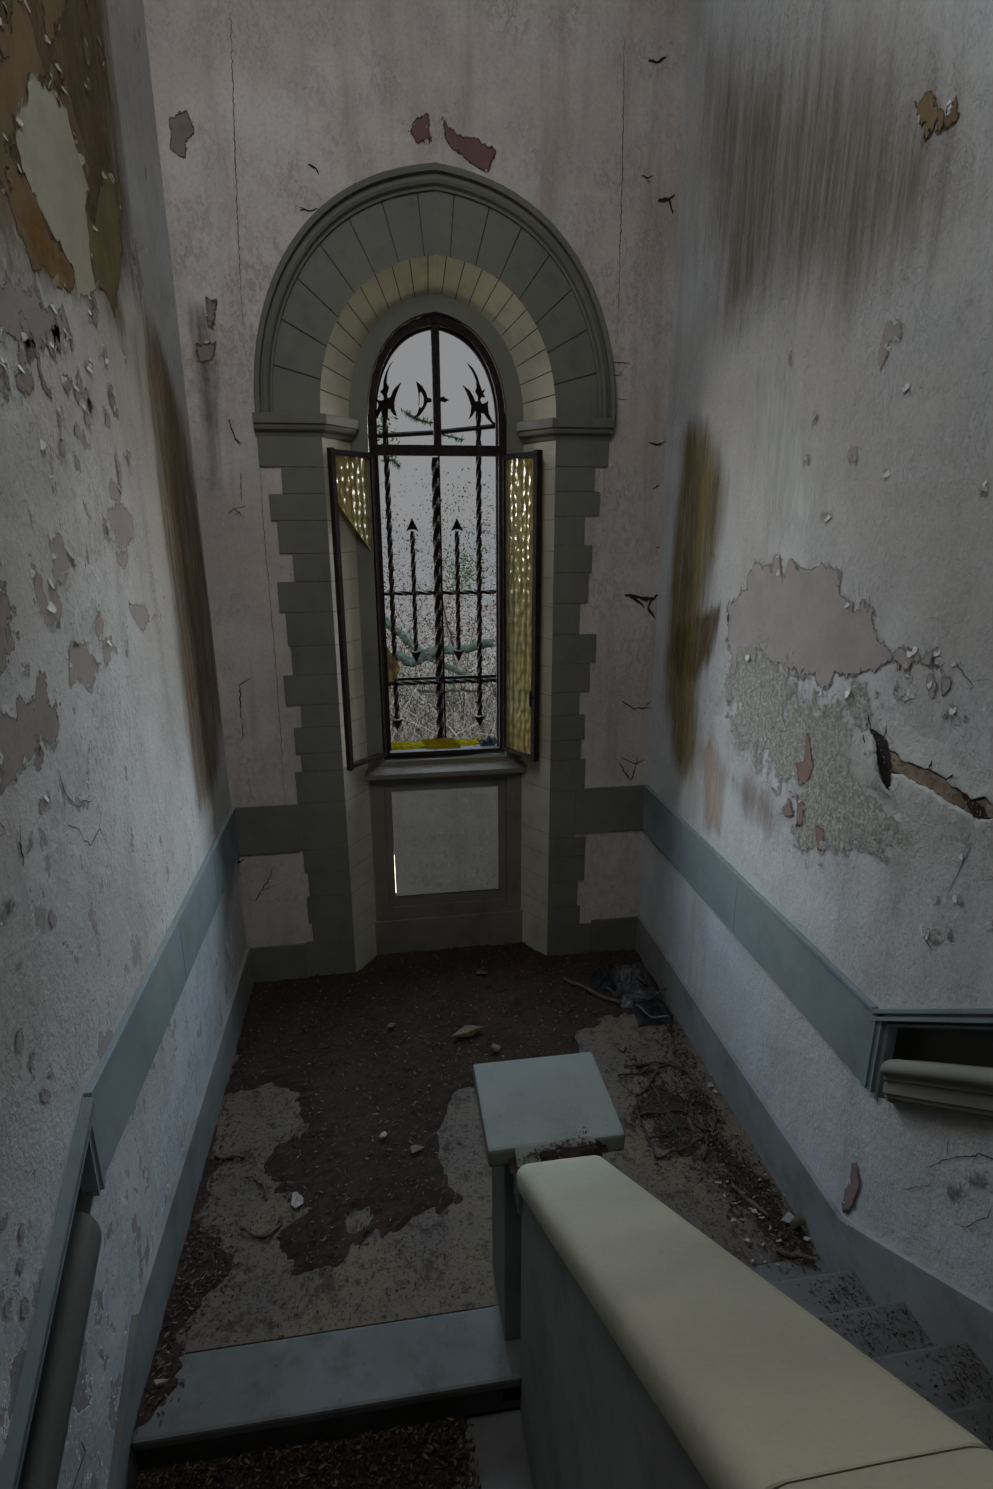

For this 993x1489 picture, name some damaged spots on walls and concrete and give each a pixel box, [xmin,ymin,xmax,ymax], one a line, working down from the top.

water stain [0,0,128,269]
peeling [0,0,128,478]
peeling [168,110,194,160]
peeling [408,113,496,174]
water stain [723,80,886,284]
peeling [914,90,960,143]
peeling [101,449,134,571]
peeling [0,532,117,794]
flaking render [715,553,967,875]
crack [0,823,24,865]